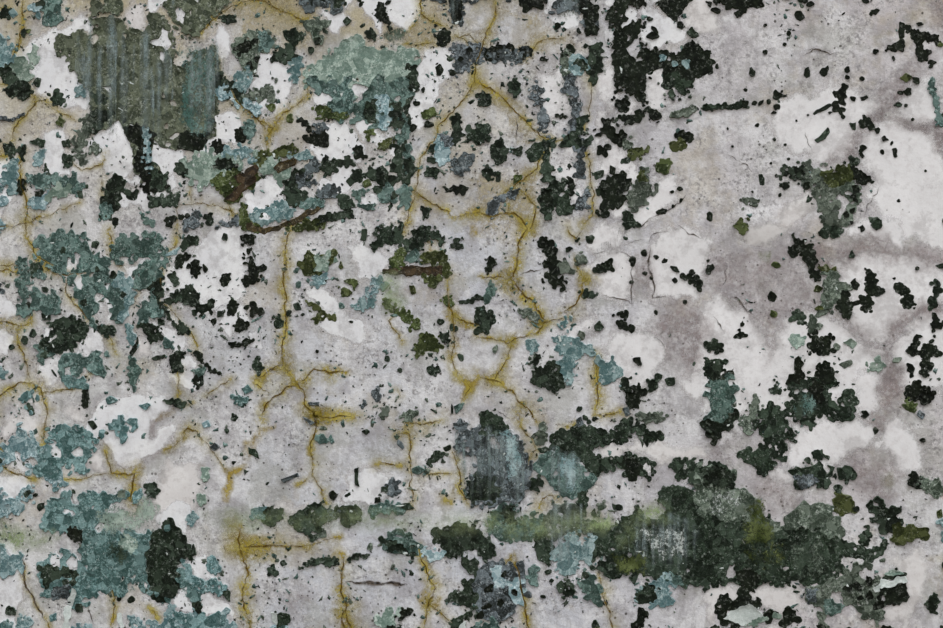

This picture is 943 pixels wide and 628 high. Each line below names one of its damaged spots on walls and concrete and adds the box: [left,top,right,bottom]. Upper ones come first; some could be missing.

crack [0,89,85,316]
crack [403,0,589,465]
crack [600,197,701,304]
crack [0,314,73,439]
peeling [0,0,533,628]
crack [258,230,351,500]
spalling [293,0,943,628]
crack [66,451,135,499]
crack [383,420,466,502]
crack [22,560,50,628]
crack [224,528,449,628]
crack [506,555,529,628]